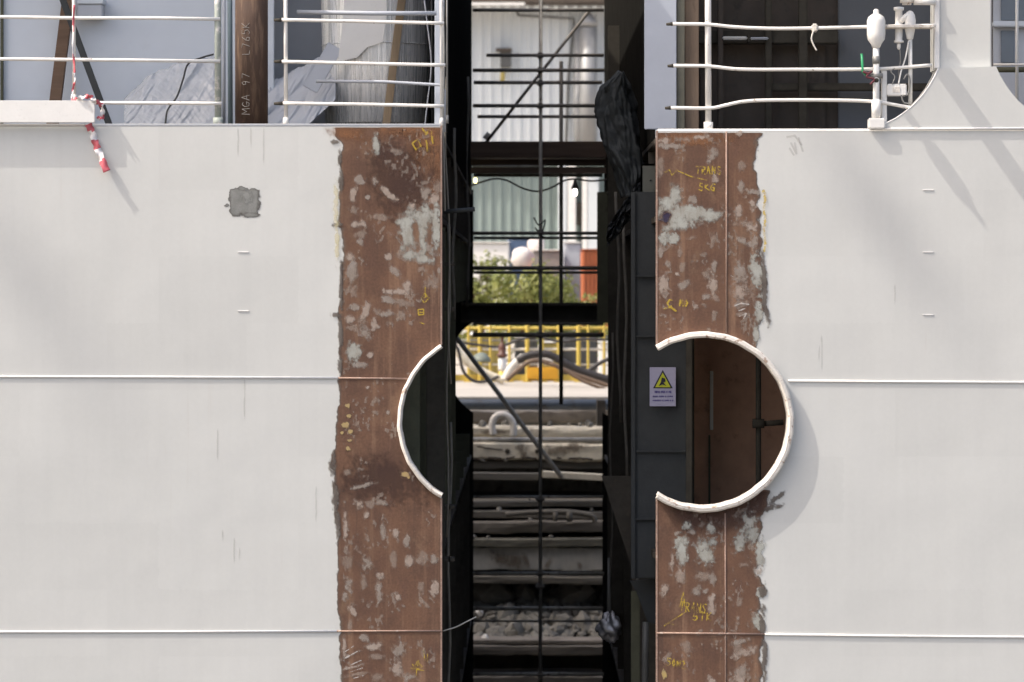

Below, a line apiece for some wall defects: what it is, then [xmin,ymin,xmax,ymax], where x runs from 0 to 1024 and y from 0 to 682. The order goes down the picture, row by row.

rust [335,128,362,139]
rust [661,132,729,145]
rust [371,127,440,213]
peeling [224,186,261,218]
peeling [734,182,763,341]
peeling [340,403,353,451]
rust [345,459,421,500]
rust [677,491,764,528]
peeling [734,514,765,597]
peeling [734,640,755,682]